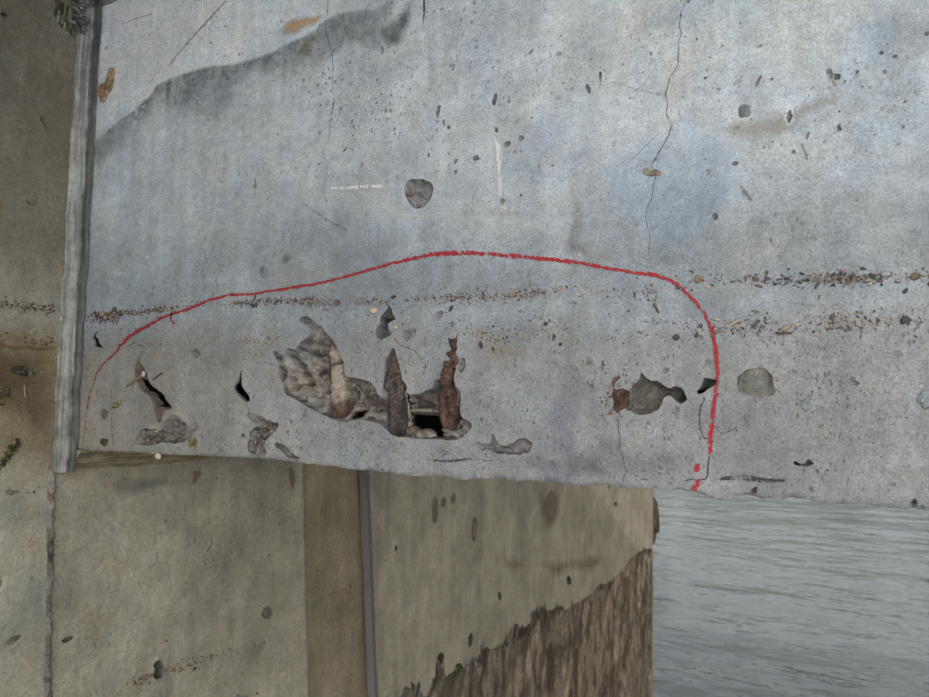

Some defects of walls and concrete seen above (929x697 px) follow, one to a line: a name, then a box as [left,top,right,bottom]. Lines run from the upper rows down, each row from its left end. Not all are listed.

rust [286,17,318,31]
water stain [389,12,408,42]
water stain [183,56,272,93]
crack [645,0,686,269]
spalling [376,306,393,340]
spalling [134,352,198,446]
spalling [273,316,533,455]
rust [600,375,641,422]
spalling [628,367,687,415]
spalling [697,378,716,394]
spalling [241,412,300,461]